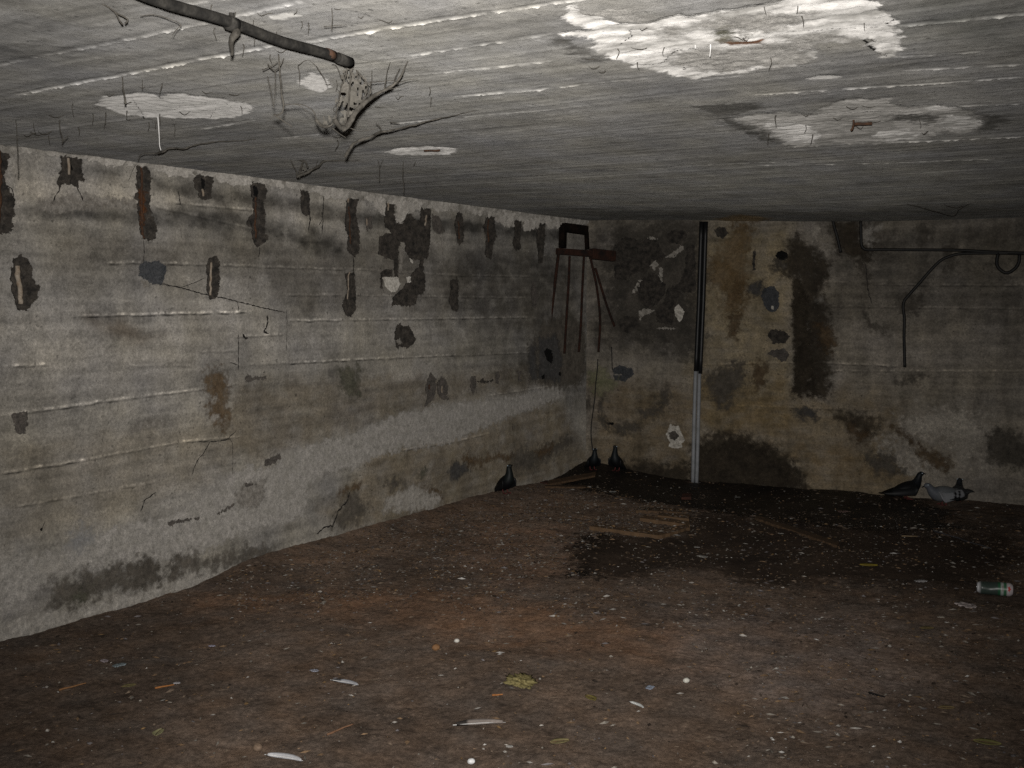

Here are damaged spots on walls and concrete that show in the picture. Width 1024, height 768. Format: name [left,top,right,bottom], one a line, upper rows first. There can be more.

water stain [552,39,598,62]
water stain [697,103,762,139]
spalling [0,146,19,235]
spalling [10,254,41,311]
spalling [53,154,85,202]
spalling [128,166,179,288]
spalling [246,181,268,257]
spalling [342,198,464,317]
water stain [780,221,885,421]
crack [192,431,236,474]
water stain [0,317,671,641]
water stain [554,397,1024,591]